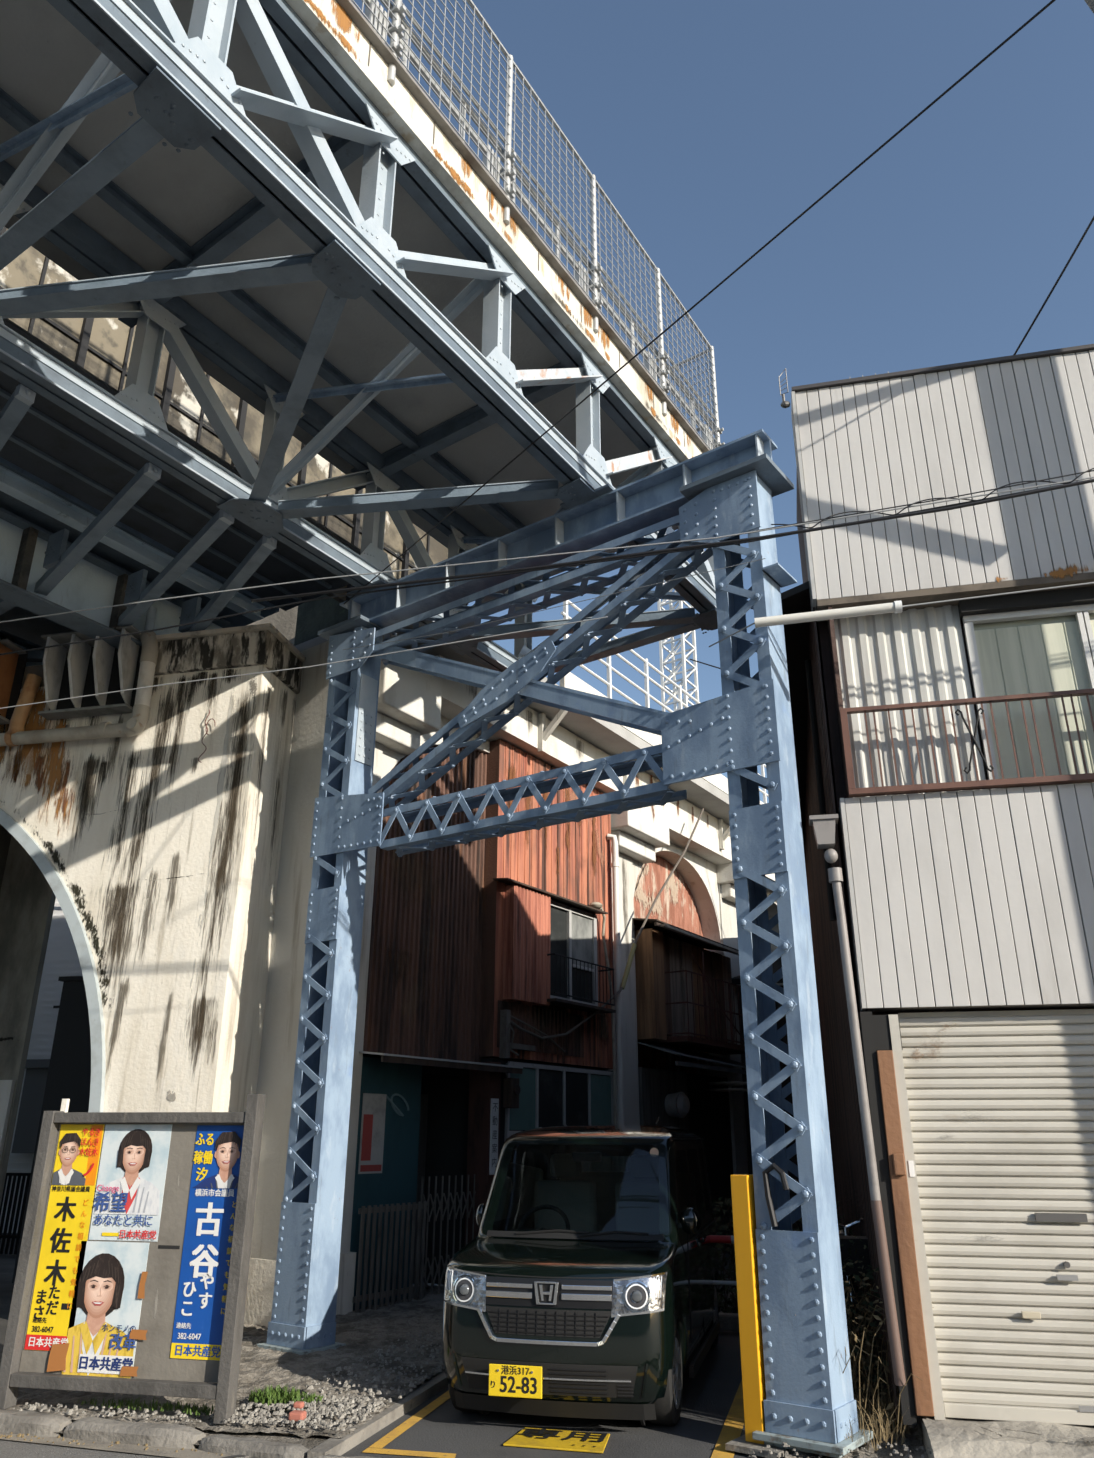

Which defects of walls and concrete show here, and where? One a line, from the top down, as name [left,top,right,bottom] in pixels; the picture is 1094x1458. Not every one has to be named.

corrosion [331,0,360,52]
corrosion [460,158,516,242]
corrosion [558,275,610,360]
corrosion [0,687,75,834]
water stain [72,669,296,1078]